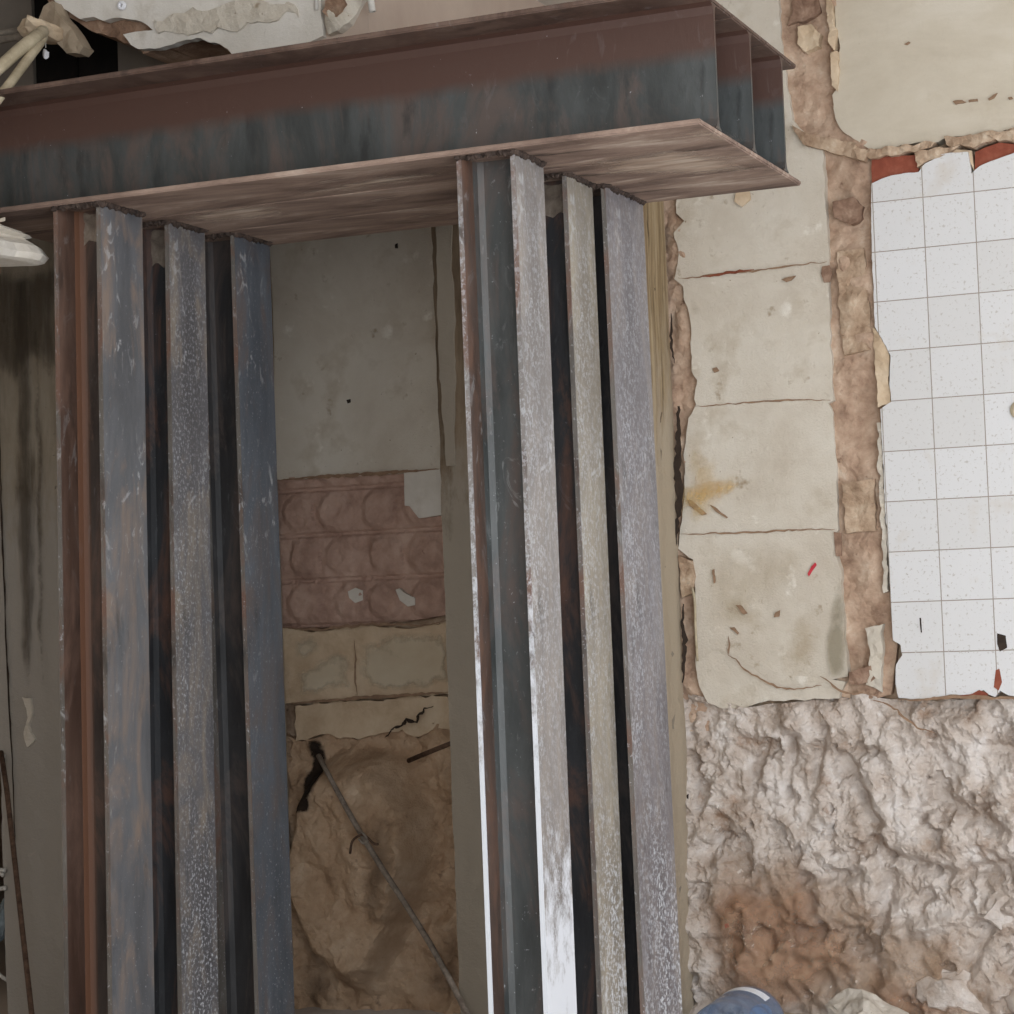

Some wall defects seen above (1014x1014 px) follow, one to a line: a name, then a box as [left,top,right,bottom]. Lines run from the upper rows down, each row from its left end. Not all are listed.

peeling [154,0,299,36]
flaking render [792,125,1014,169]
flaking render [734,191,751,207]
flaking render [821,265,832,283]
peeling [873,327,891,408]
flaking render [664,200,728,731]
leakage [20,371,40,647]
peeling [834,422,890,593]
crack [283,620,448,737]
peeling [865,624,885,692]
spalling [296,741,325,812]